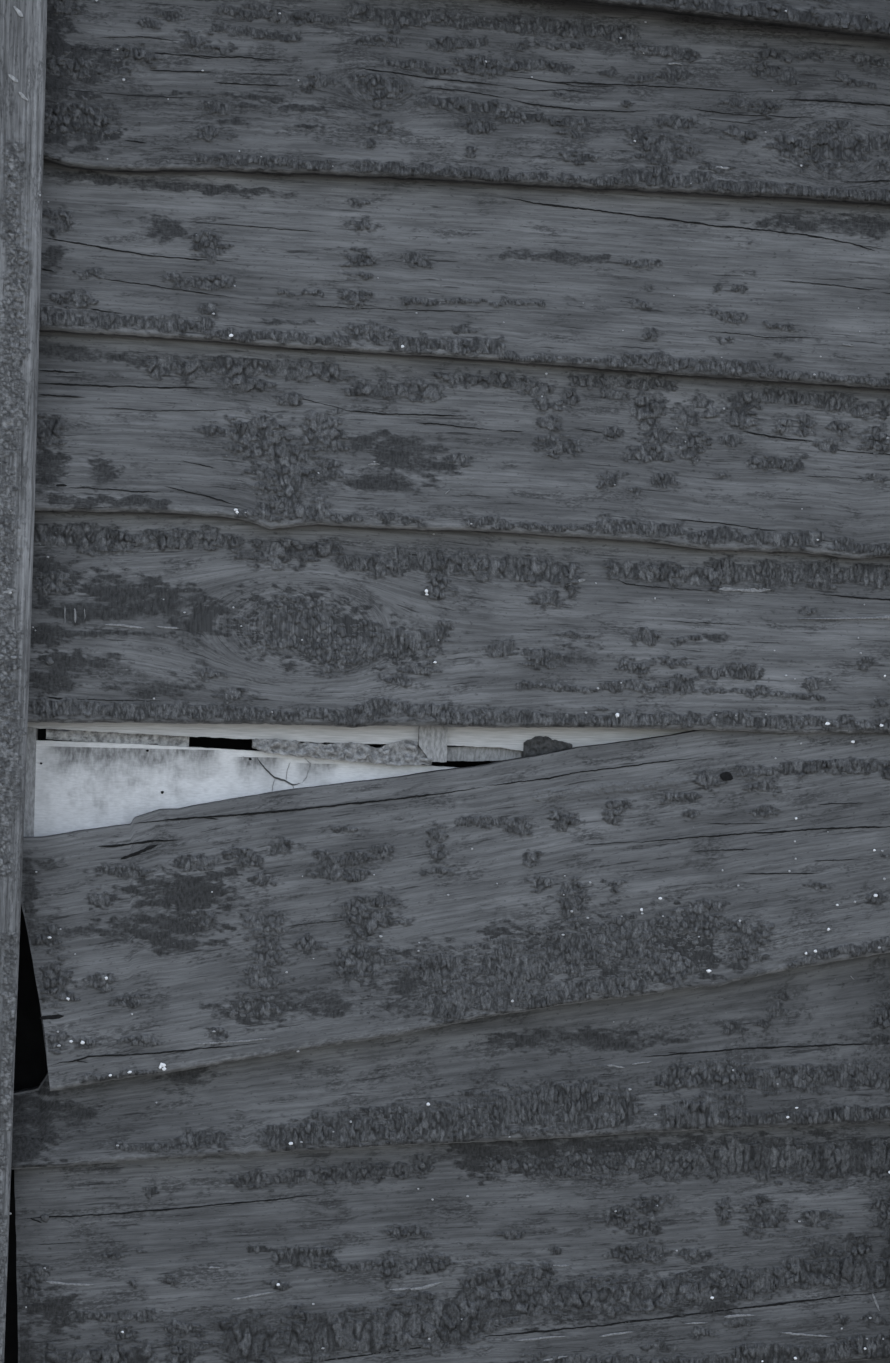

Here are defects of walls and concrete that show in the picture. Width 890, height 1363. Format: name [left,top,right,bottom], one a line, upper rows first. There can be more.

crack [503,197,882,251]
crack [98,756,697,859]